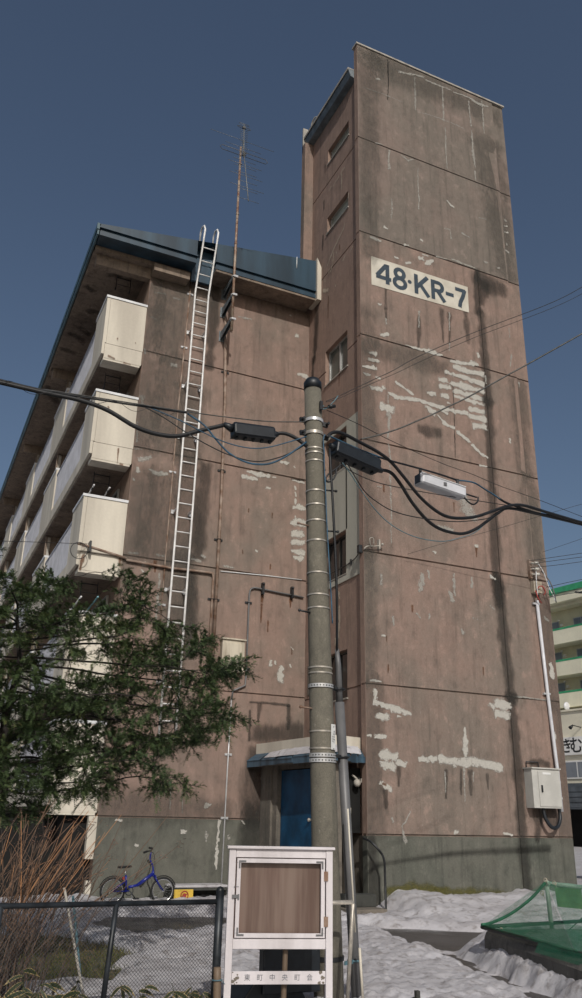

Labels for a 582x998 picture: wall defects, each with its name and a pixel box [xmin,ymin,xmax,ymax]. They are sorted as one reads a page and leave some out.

spalling [241,470,276,489]
peeling [280,460,306,562]
damp [436,256,554,890]